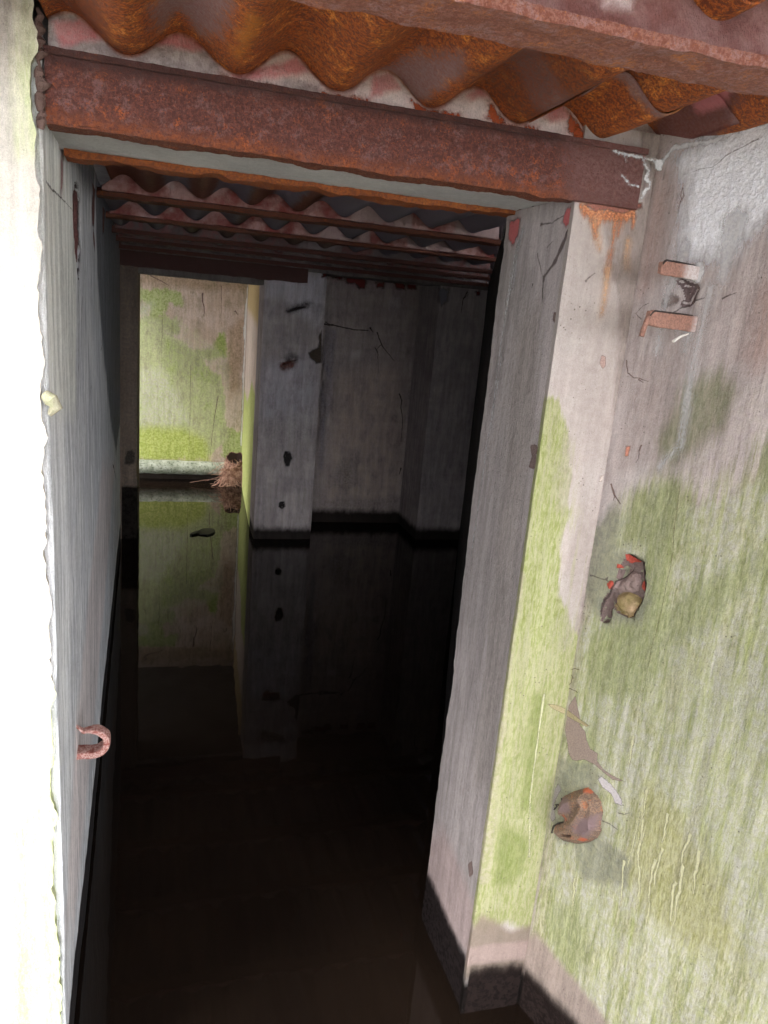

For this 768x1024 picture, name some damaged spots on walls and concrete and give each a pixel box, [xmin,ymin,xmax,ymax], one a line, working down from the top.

corrosion [567,115,584,138]
crack [532,217,568,299]
corrosion [580,203,642,311]
leakage [615,123,768,339]
crack [324,322,392,358]
spalling [600,554,647,623]
leakage [529,694,545,856]
peeling [548,697,622,806]
leakage [620,787,669,924]
leakage [670,833,701,925]
leakage [421,875,572,1024]